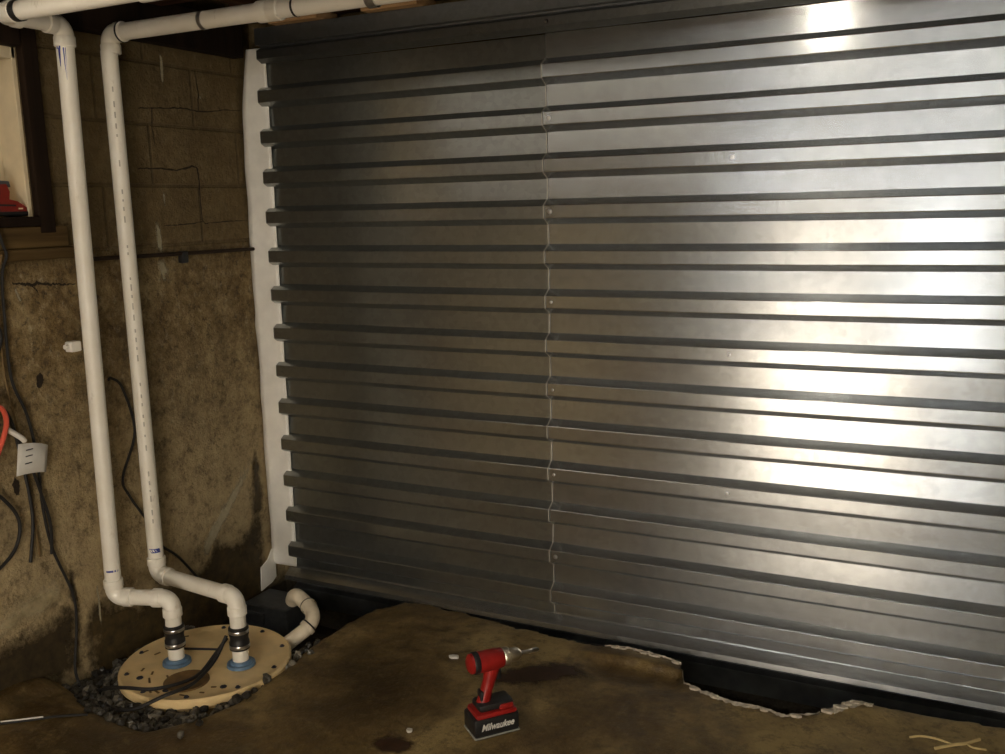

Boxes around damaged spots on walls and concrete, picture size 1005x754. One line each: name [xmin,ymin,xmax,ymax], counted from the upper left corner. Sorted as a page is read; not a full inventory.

damp [198,453,267,602]
damp [160,586,230,628]
spalling [604,645,874,718]
damp [373,735,413,753]